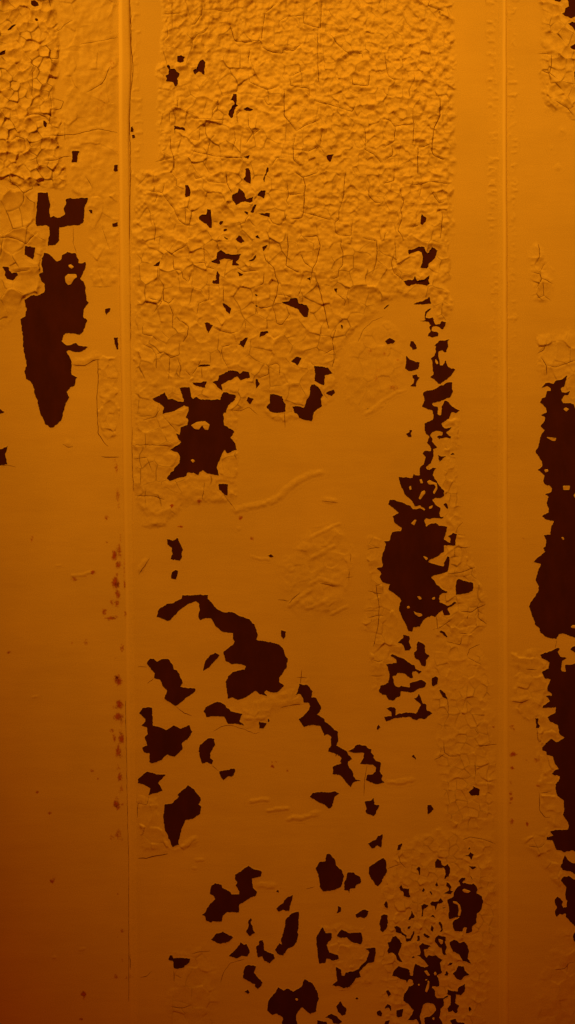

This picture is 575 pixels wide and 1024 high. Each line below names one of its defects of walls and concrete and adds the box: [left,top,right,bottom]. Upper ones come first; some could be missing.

peeling [0,0,119,430]
crack [12,3,446,376]
peeling [105,0,497,1024]
peeling [516,326,575,1015]